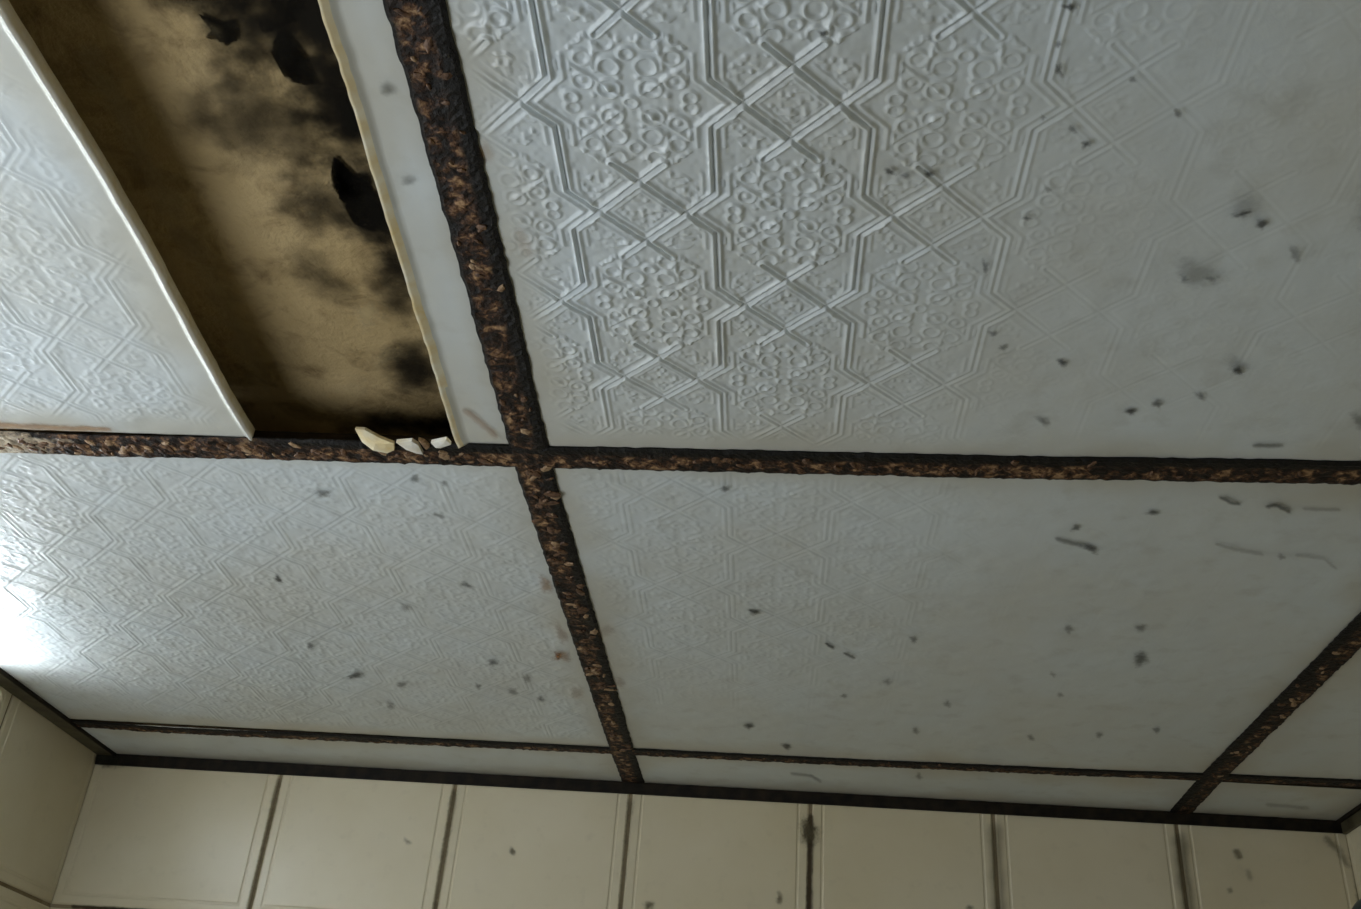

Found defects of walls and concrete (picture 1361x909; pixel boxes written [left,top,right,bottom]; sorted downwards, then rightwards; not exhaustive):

rust [411,38,453,105]
leakage [193,0,410,317]
leakage [383,346,436,391]
rust [0,438,493,465]
peeling [355,427,451,454]
leakage [365,414,453,437]
rust [498,393,532,435]
rust [525,466,664,780]